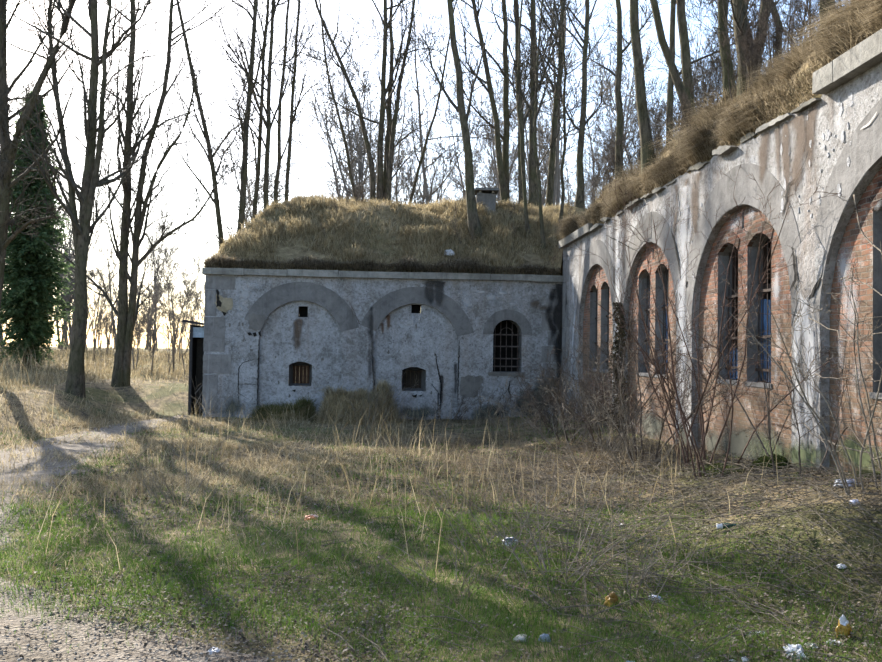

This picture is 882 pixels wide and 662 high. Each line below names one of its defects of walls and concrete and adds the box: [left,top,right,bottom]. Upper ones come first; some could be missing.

damp [759,104,817,206]
crack [782,147,809,216]
peeling [215,288,269,404]
damp [425,281,444,304]
damp [546,277,575,382]
damp [614,216,625,307]
crack [787,230,820,323]
damp [794,286,814,421]